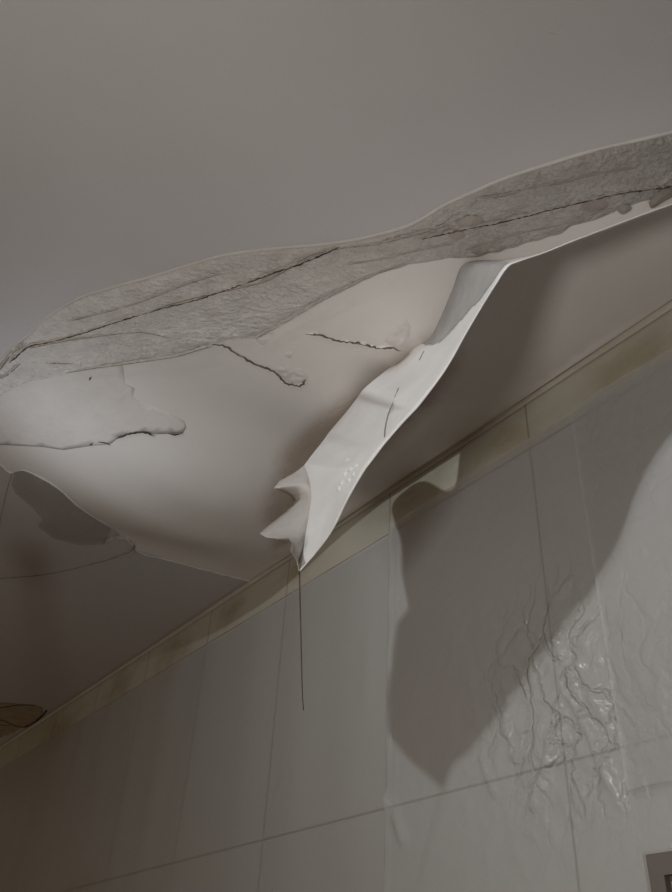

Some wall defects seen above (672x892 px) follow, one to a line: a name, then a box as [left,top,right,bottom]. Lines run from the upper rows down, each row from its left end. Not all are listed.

peeling [0,131,672,710]
damp [0,703,47,737]